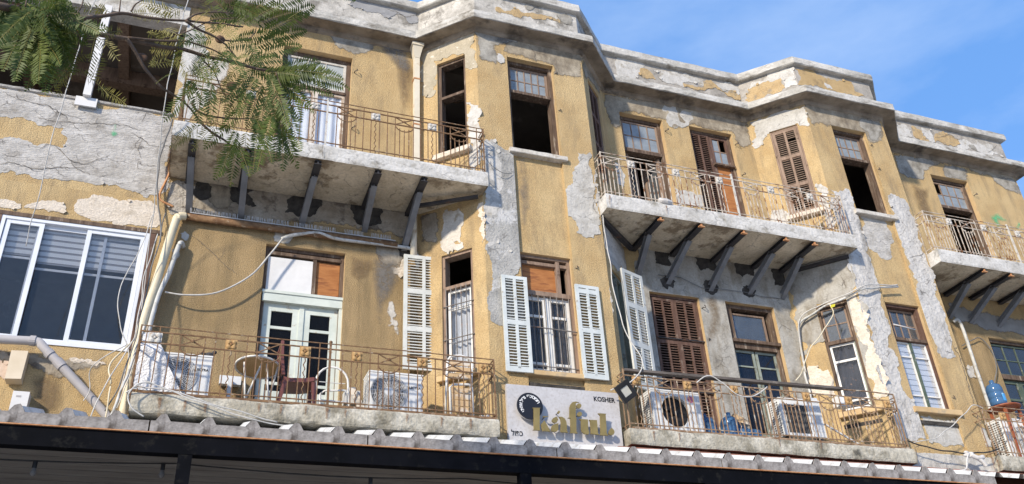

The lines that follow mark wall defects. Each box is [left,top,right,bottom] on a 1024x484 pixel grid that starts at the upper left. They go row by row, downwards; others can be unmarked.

peeling [495,7,572,25]
crack [3,93,155,175]
peeling [0,22,464,278]
peeling [420,32,883,149]
peeling [466,102,524,329]
peeling [387,301,399,334]
peeling [566,152,1024,447]